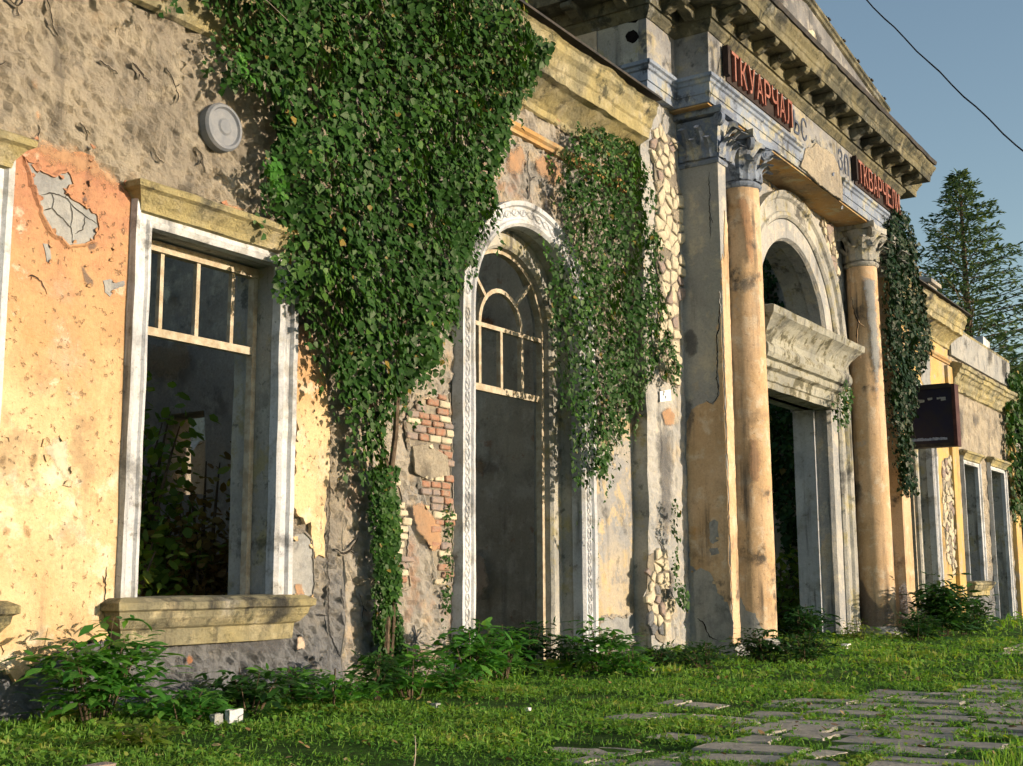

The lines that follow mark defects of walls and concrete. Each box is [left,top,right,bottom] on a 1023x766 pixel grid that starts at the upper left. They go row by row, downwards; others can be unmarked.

crack [7,0,58,36]
crack [99,60,180,104]
peeling [22,136,126,264]
flaking render [385,389,458,592]
flaking render [292,528,316,598]
peeling [297,633,305,655]